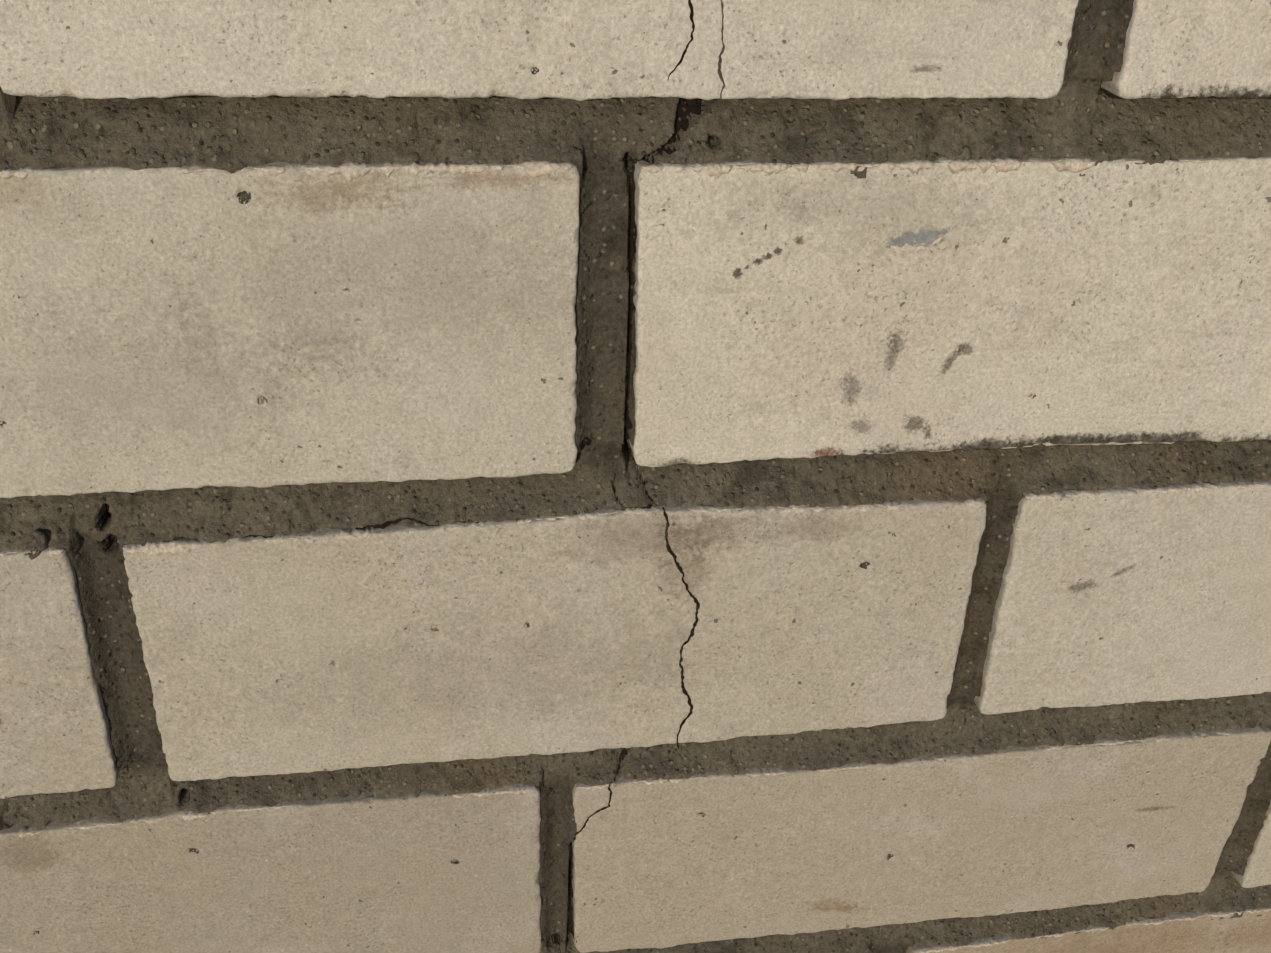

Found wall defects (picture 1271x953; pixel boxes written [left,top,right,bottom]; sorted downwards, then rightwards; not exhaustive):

crack [612,0,725,749]
crack [558,748,630,952]